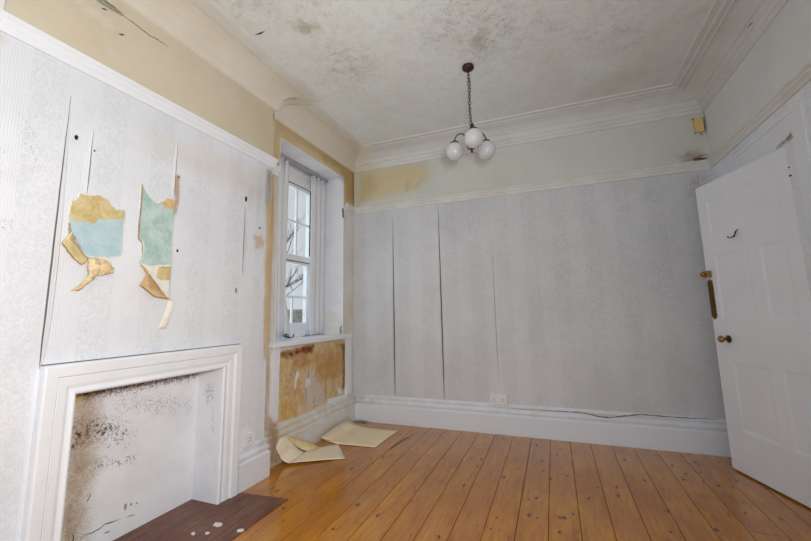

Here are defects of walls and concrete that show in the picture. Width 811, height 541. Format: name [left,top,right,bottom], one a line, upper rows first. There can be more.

flaking render [70,194,125,224]
flaking render [142,264,171,298]
leakage [124,115,435,468]
leakage [61,373,198,541]
flaking render [278,310,347,423]
crack [512,408,719,420]